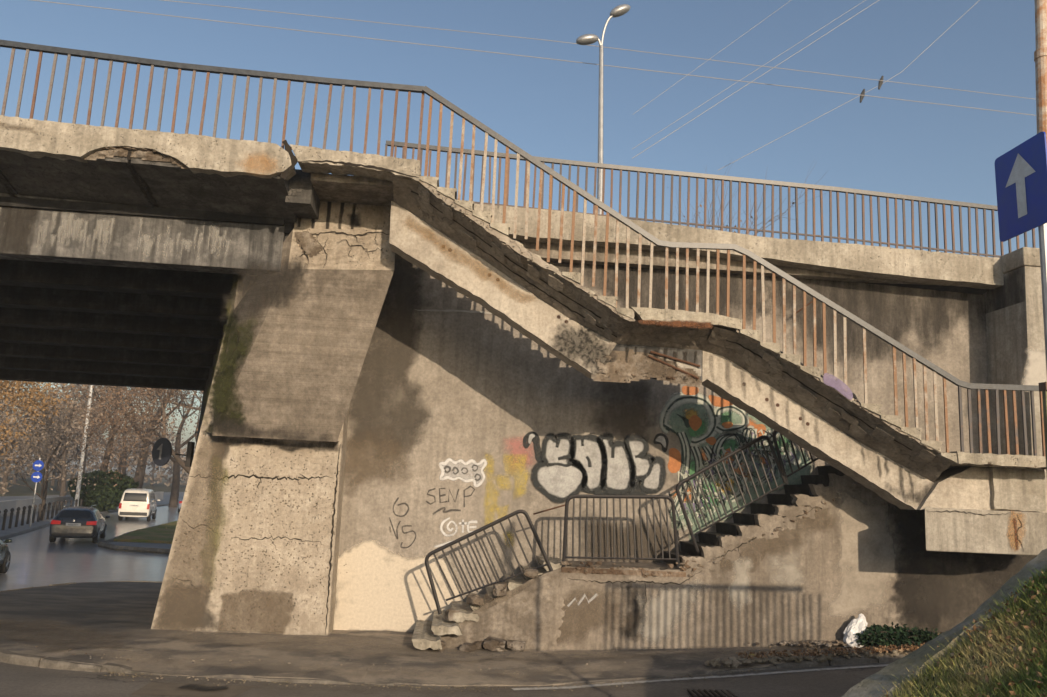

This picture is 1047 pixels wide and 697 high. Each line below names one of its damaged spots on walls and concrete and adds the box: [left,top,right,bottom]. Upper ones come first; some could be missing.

spalling [84,146,189,169]
spalling [294,157,598,297]
crack [279,140,617,337]
water stain [199,255,430,489]
spalling [584,311,702,387]
water stain [159,502,292,635]
crack [184,444,341,634]
flaking render [441,482,896,652]
water stain [878,461,934,503]
corrosion [1009,512,1021,550]